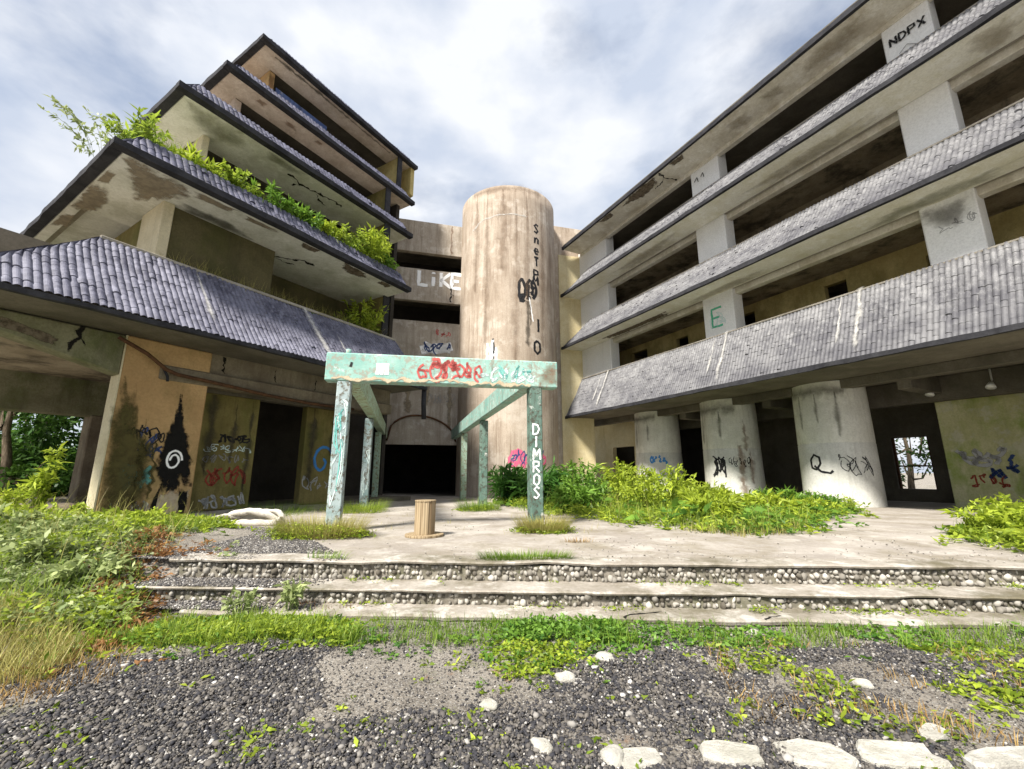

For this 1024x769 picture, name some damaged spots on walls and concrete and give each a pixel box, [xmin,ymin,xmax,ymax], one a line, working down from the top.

crack [287,173,342,207]
spalling [623,178,657,206]
crack [275,256,314,266]
crack [68,326,86,352]
peeling [331,376,531,387]
water stain [102,382,163,512]